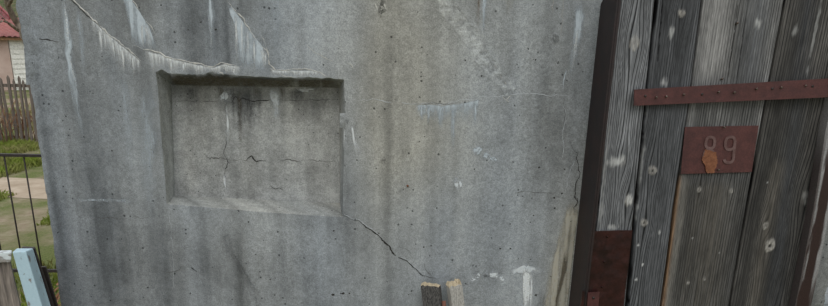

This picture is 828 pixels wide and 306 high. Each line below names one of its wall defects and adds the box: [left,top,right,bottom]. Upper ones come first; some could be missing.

water stain [63,9,83,111]
water stain [92,21,139,67]
crack [71,0,239,74]
water stain [124,0,333,132]
crack [206,138,332,175]
crack [360,93,580,222]
crack [342,214,439,279]